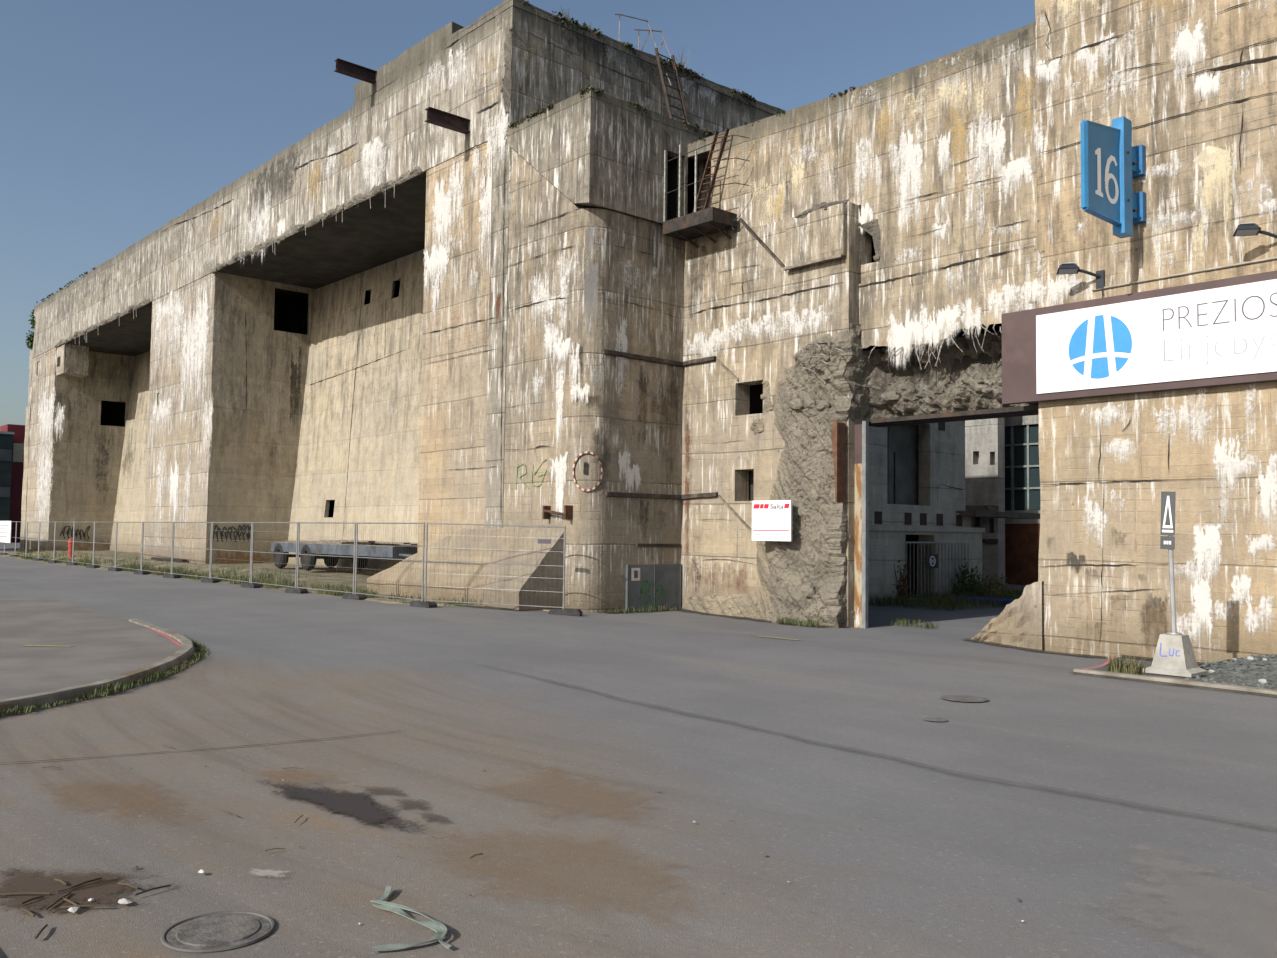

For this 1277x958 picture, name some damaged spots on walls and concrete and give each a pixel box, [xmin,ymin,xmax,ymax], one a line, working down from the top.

water stain [1036,55,1061,83]
water stain [1074,30,1140,111]
water stain [1171,19,1220,99]
water stain [242,148,299,259]
water stain [1148,143,1276,277]
water stain [882,252,1083,366]
water stain [151,281,220,544]
water stain [531,224,628,521]
water stain [593,428,648,522]
spalling [681,322,1038,628]
water stain [1154,383,1277,558]
water stain [1142,524,1274,642]